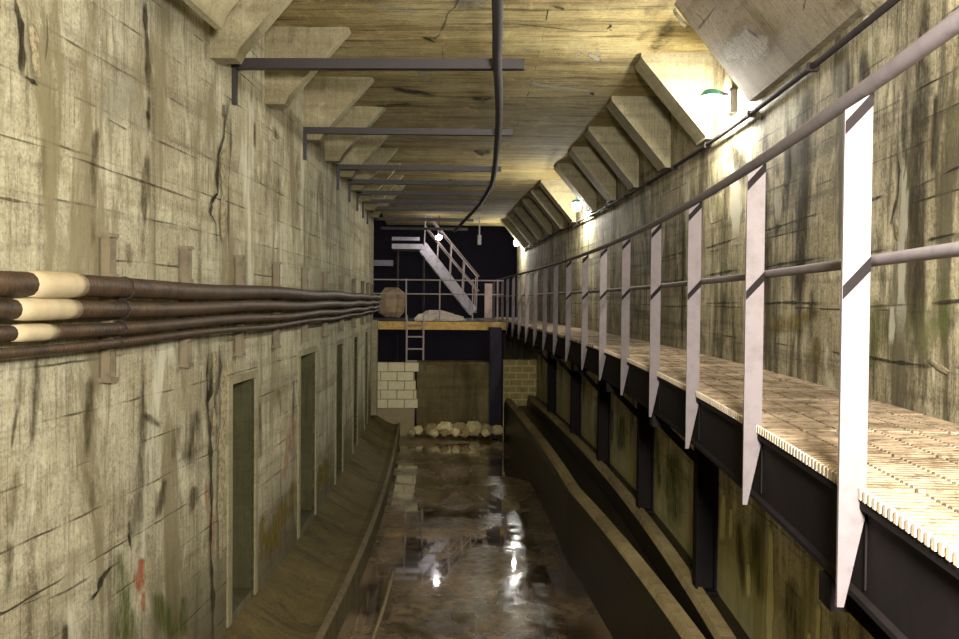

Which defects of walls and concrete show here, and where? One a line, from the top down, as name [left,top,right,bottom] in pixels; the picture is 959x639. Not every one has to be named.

crack [15,1,48,85]
crack [143,6,151,77]
water stain [846,56,869,92]
water stain [918,5,929,38]
crack [82,160,187,197]
crack [146,100,193,157]
crack [209,105,232,240]
water stain [898,57,938,251]
water stain [889,261,923,339]
water stain [719,495,751,599]
water stain [766,527,774,639]